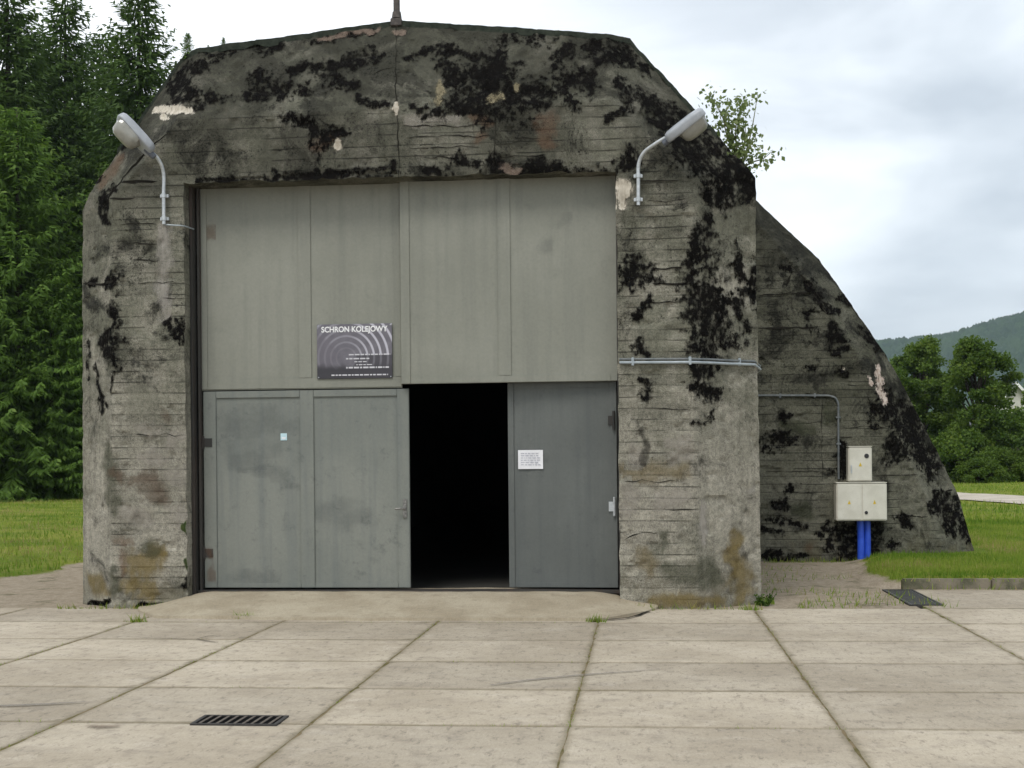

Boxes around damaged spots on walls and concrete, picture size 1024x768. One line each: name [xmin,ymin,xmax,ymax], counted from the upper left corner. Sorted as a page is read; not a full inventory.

spalling [152,105,194,121]
damp [165,28,401,184]
crack [374,26,546,178]
damp [96,175,118,226]
damp [402,32,757,426]
spalling [615,178,633,210]
damp [84,270,128,415]
damp [800,278,886,379]
spalling [868,364,888,405]
damp [828,438,847,481]
damp [866,381,971,545]
damp [760,482,915,562]